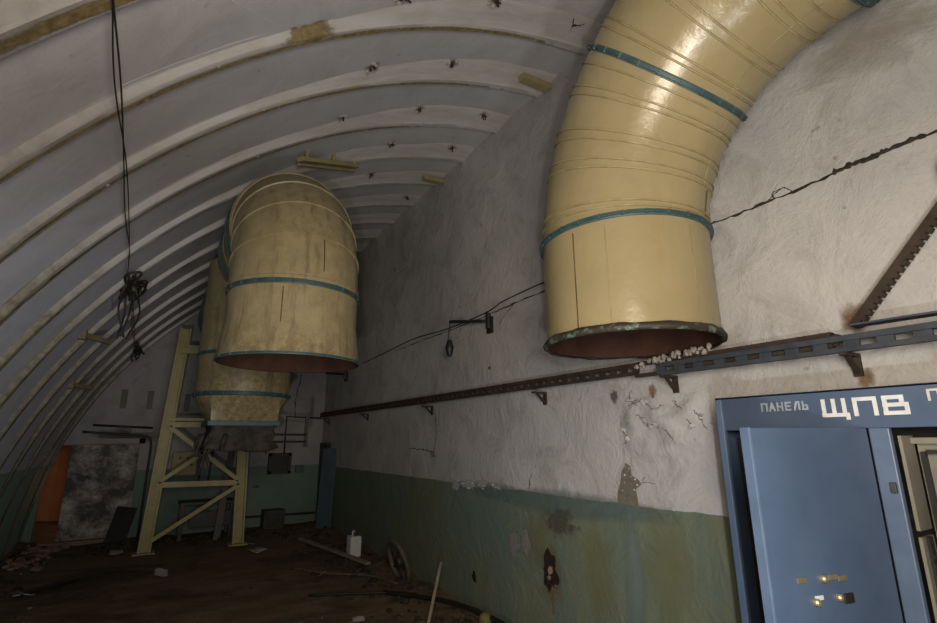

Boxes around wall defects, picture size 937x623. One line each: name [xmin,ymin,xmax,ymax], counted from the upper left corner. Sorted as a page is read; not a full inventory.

crack [712,129,937,224]
peeling [452,457,657,517]
spalling [543,548,560,614]